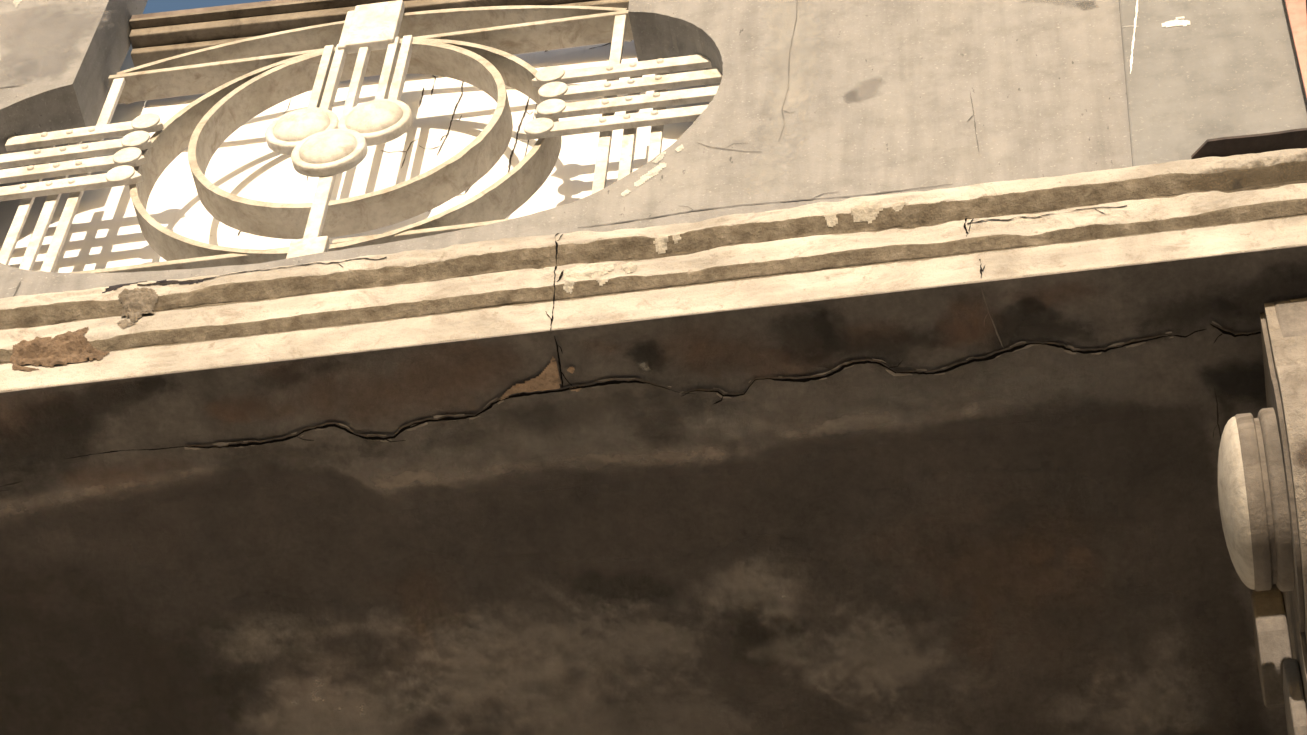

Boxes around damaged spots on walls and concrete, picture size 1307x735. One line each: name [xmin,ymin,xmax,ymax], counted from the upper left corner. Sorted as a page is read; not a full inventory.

crack [381,75,463,168]
spalling [102,277,215,329]
crack [66,184,1261,459]
spalling [10,327,110,372]
peeling [500,357,582,400]
damp [1205,366,1266,403]
damp [0,402,1262,735]